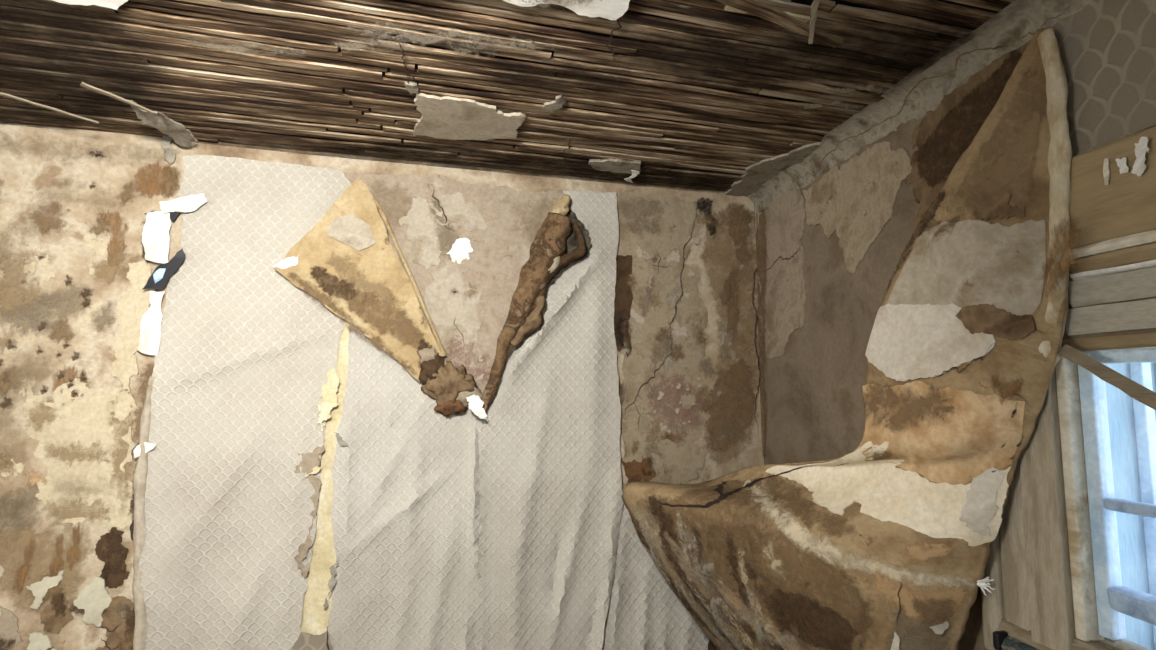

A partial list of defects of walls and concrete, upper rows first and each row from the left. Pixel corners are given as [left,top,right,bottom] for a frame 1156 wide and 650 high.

damp [32,202,69,234]
damp [0,256,115,409]
peeling [0,375,140,650]
damp [49,364,153,518]
peeling [273,255,299,269]
peeling [294,446,325,577]
flaking render [325,172,563,394]
crack [624,202,700,429]
damp [632,204,759,473]
damp [744,475,975,623]
damp [863,385,953,431]
peeling [1116,137,1150,177]